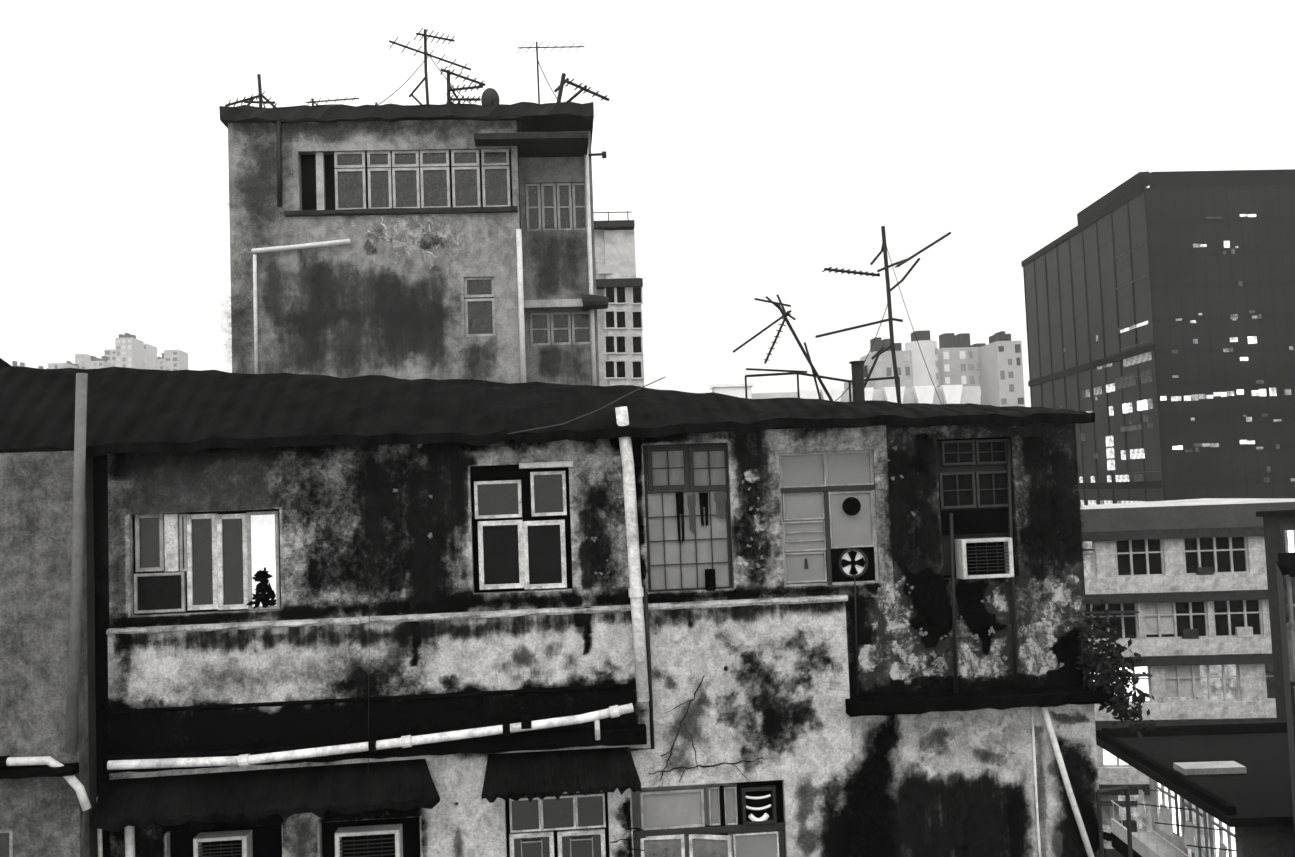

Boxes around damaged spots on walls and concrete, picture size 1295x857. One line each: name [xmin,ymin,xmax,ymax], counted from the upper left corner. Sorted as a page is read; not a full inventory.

water stain [261,252,460,379]
water stain [532,229,586,297]
water stain [539,346,592,383]
water stain [99,427,1086,775]
crack [648,675,767,782]
water stain [796,714,1032,857]